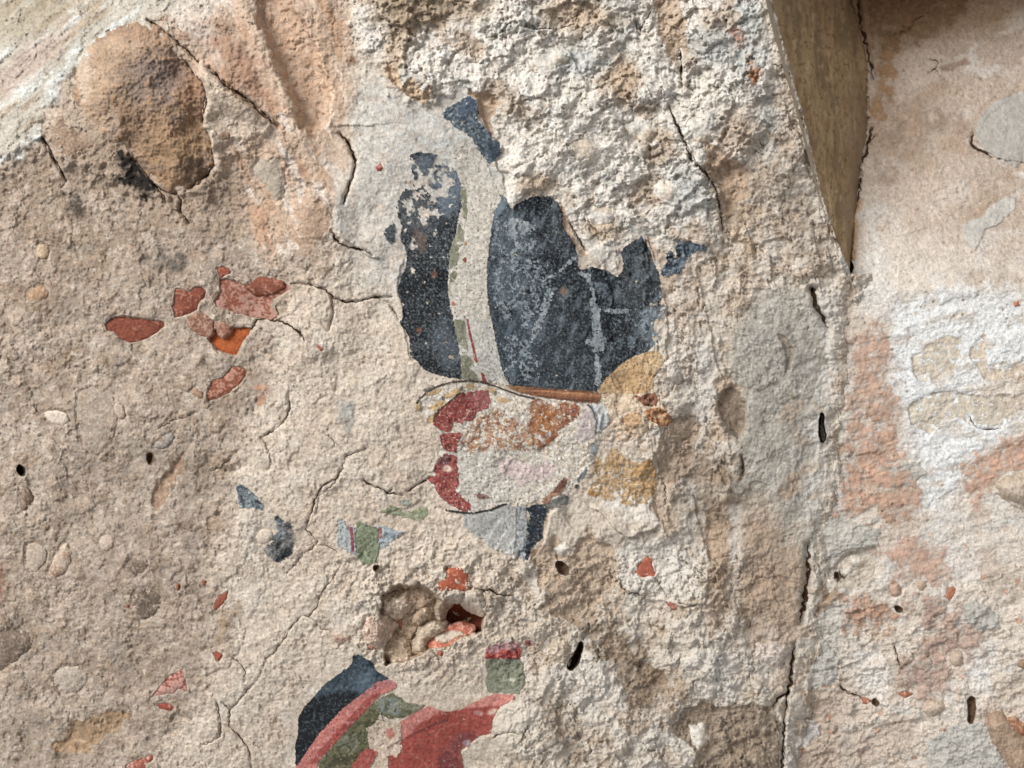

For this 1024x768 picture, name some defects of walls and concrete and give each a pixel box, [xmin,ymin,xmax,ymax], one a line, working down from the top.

crack [148,20,277,126]
crack [43,139,65,177]
crack [134,157,215,223]
crack [339,133,357,203]
spalling [347,0,790,275]
crack [669,51,723,230]
crack [332,232,373,256]
crack [252,309,305,341]
crack [291,283,397,328]
spalling [379,582,486,666]
crack [771,545,811,768]